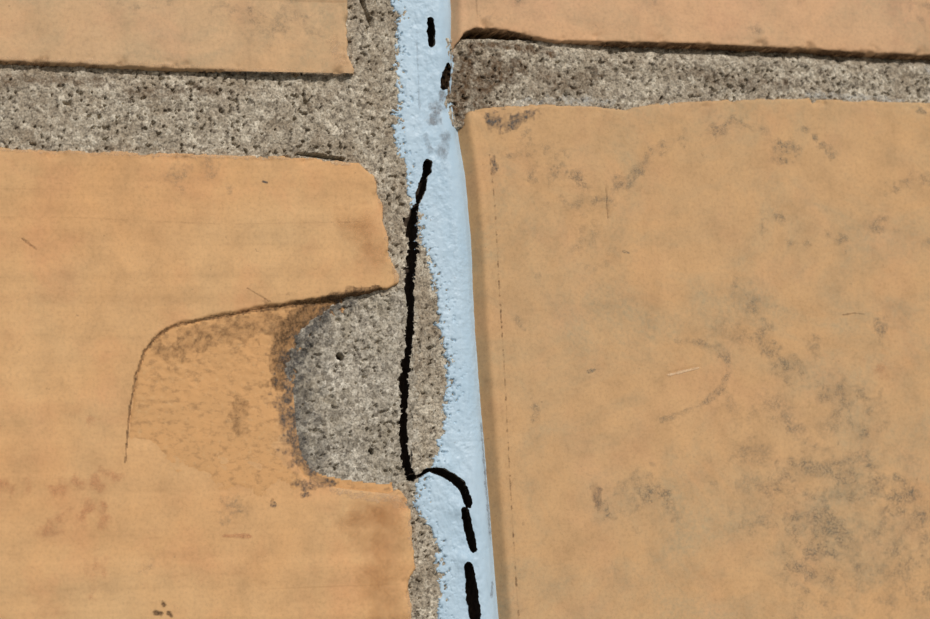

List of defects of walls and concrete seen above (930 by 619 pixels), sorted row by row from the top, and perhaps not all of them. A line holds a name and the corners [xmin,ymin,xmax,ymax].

spalling [126,257,423,501]
crack [397,160,481,619]